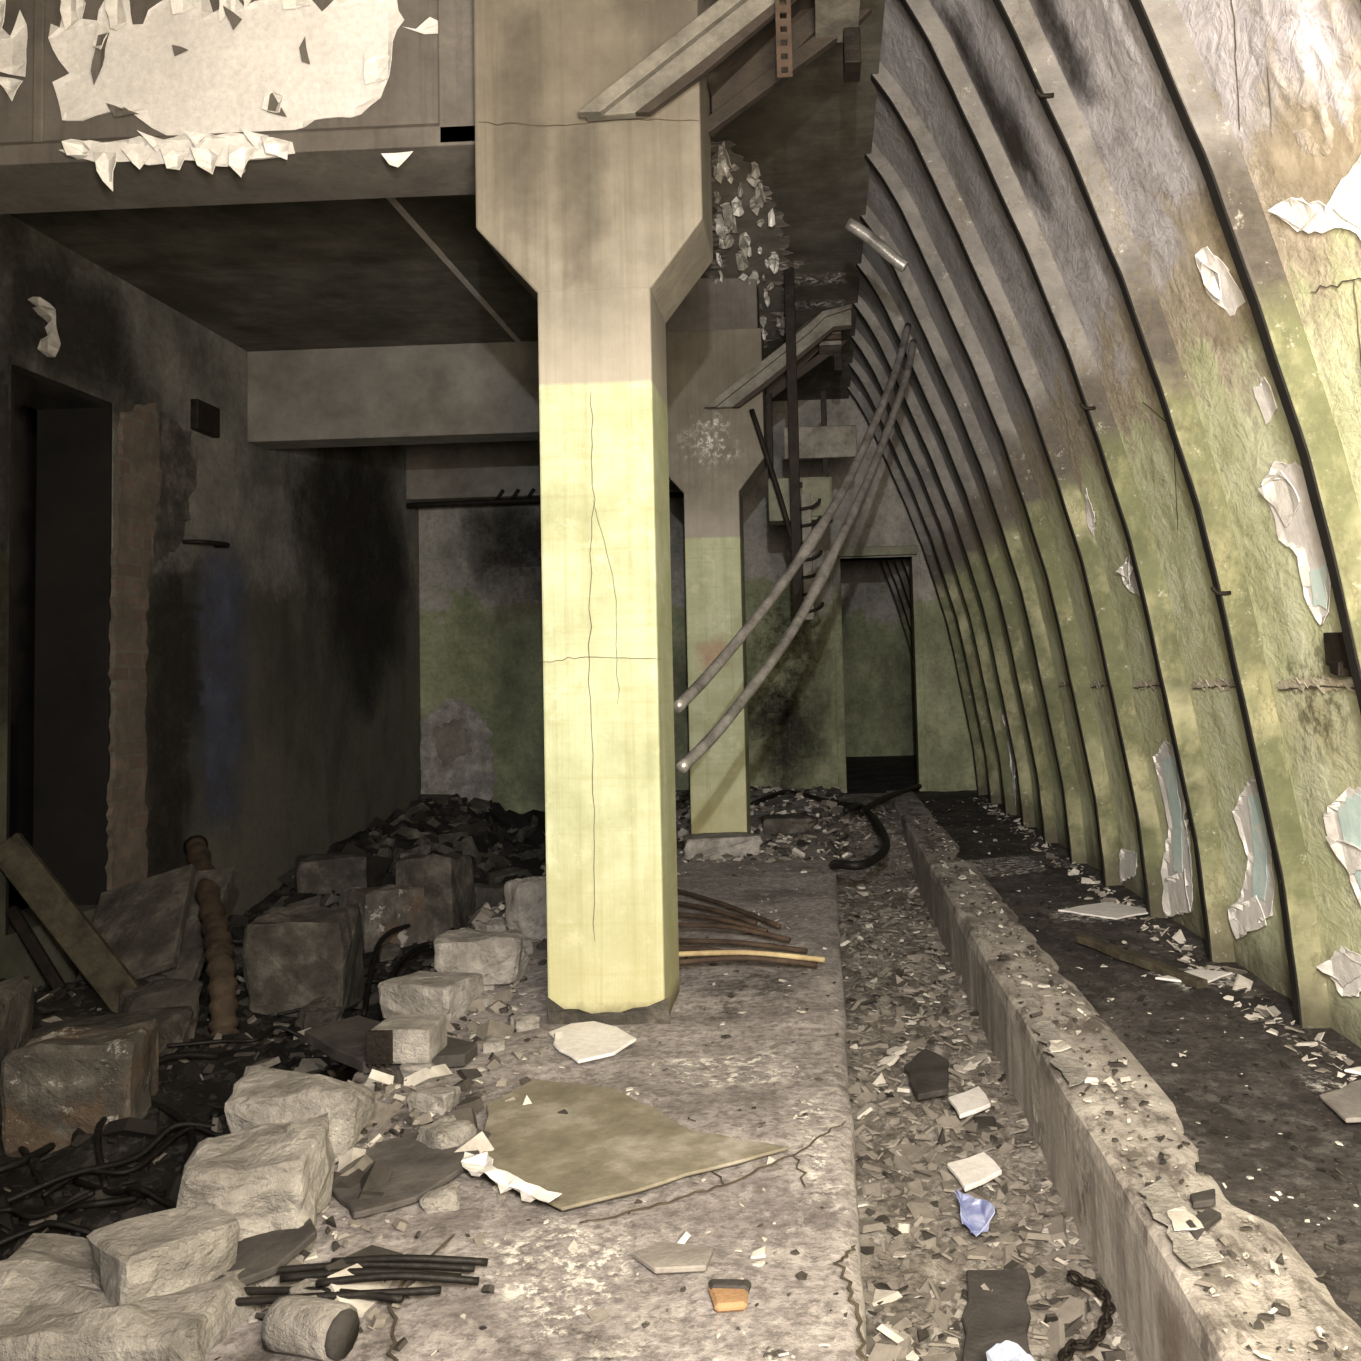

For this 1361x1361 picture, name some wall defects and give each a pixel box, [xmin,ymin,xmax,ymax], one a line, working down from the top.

peeling [0,0,28,101]
peeling [48,0,438,191]
peeling [1268,155,1361,240]
peeling [28,297,61,357]
peeling [1195,247,1245,316]
peeling [1258,461,1332,625]
peeling [1153,740,1193,918]
peeling [1228,775,1275,939]
peeling [1323,787,1361,906]
peeling [1316,946,1361,997]